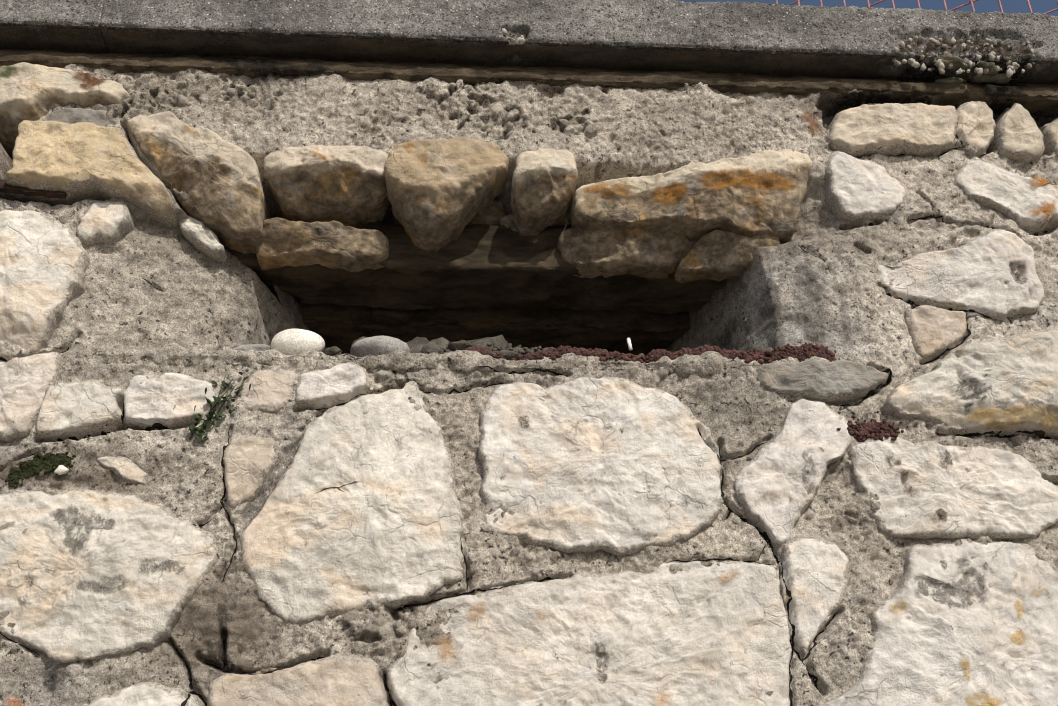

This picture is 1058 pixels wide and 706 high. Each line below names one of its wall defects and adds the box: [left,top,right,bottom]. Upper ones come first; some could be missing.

spalling [890,35,1037,85]
crack [25,403,169,458]
crack [193,428,237,583]
crack [666,428,838,706]